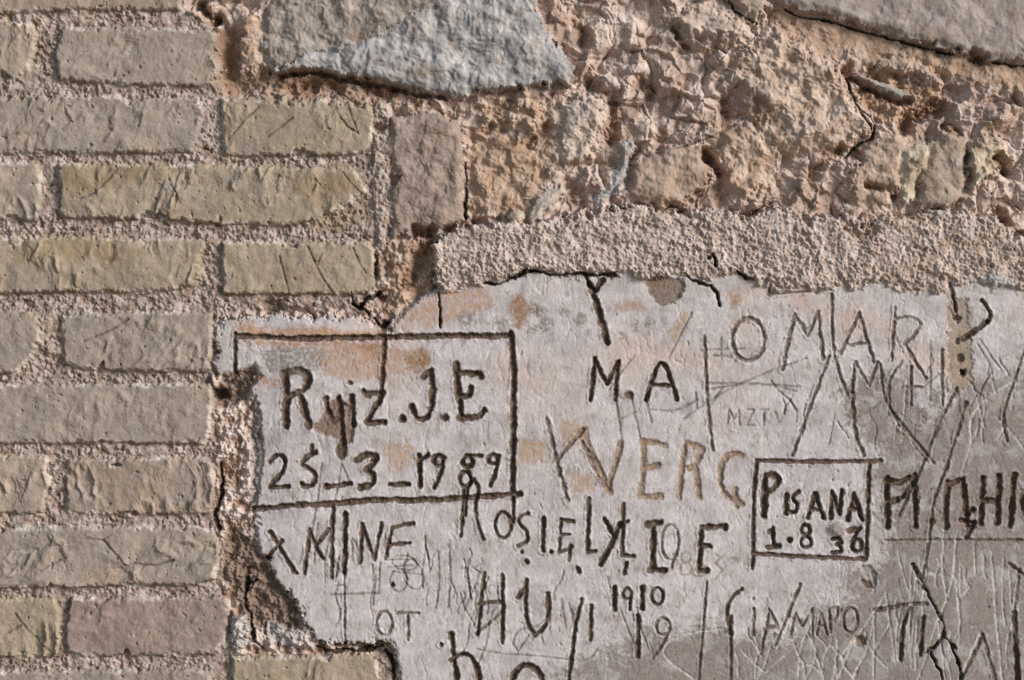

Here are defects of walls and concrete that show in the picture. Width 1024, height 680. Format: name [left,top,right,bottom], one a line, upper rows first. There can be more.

crack [844,78,875,159]
flaking render [528,272,551,283]
crack [483,268,616,287]
flaking render [214,315,264,508]
flaking render [224,528,312,648]